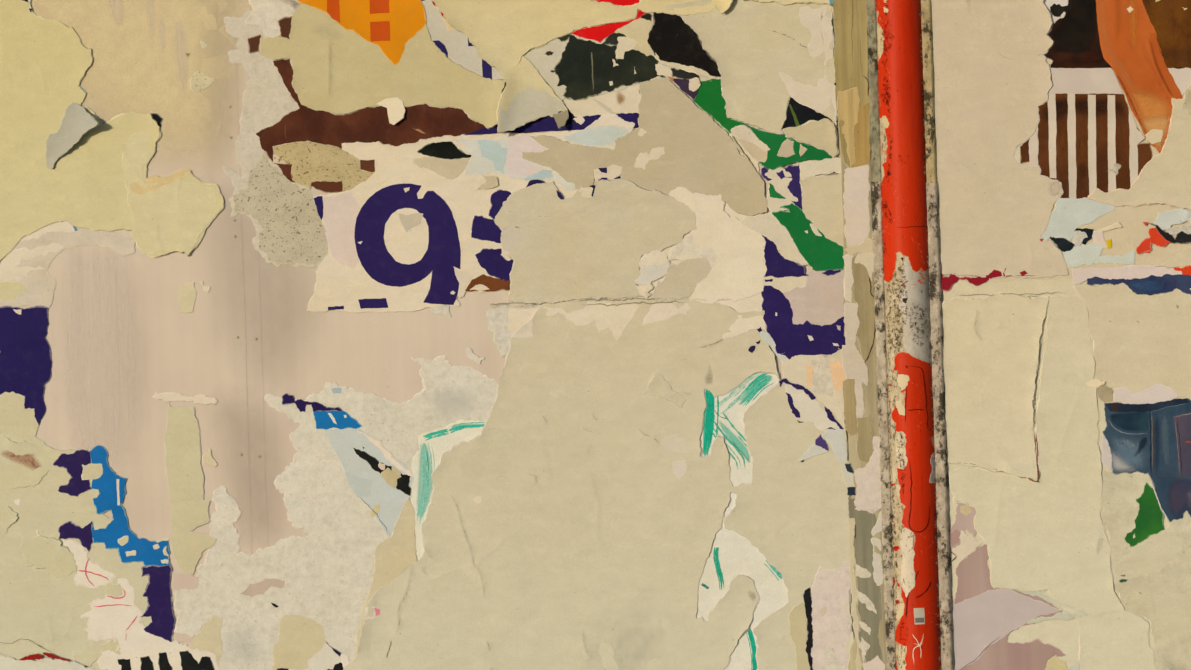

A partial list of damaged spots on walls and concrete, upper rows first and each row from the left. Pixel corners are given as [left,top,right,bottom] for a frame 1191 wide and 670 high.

peeling [278,16,292,39]
peeling [247,34,261,54]
peeling [377,97,406,125]
peeling [777,139,807,157]
peeling [81,463,103,480]
peeling [118,536,136,557]